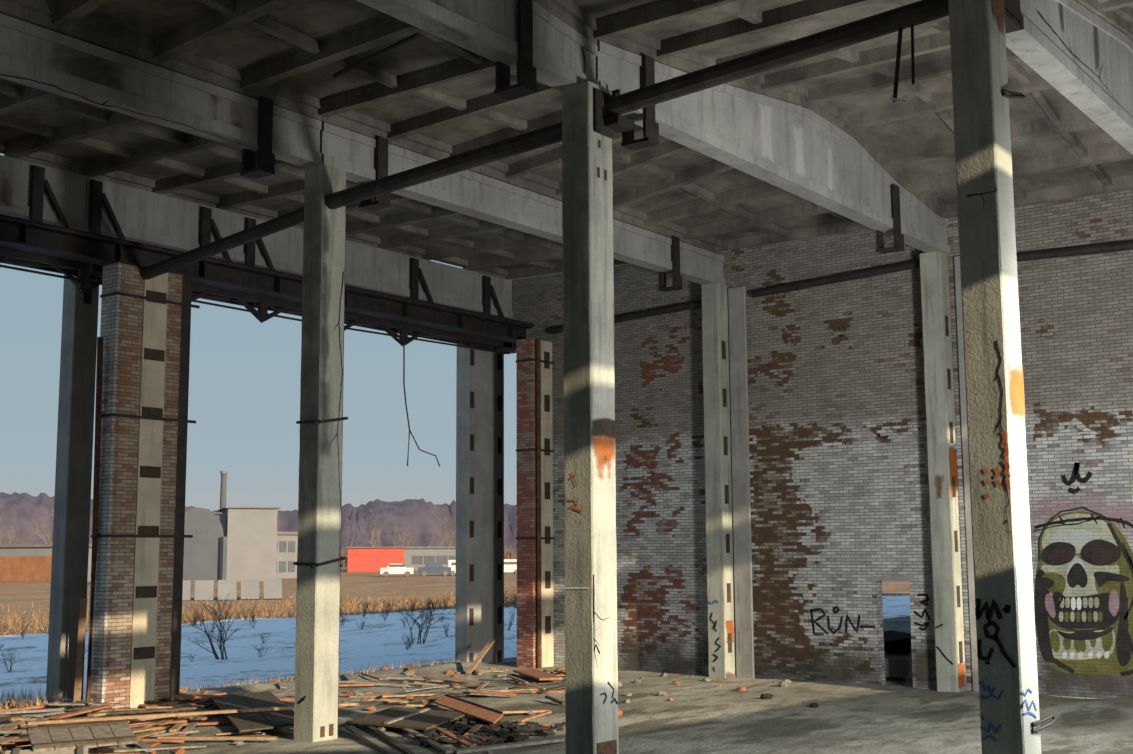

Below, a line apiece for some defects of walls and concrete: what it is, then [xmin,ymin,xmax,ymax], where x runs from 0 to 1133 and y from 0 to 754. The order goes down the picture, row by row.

spalling [1036,319,1055,339]
peeling [640,337,684,395]
rust [592,434,616,476]
peeling [630,407,658,428]
crack [994,340,1010,533]
spalling [1033,403,1133,443]
peeling [622,432,704,537]
peeling [695,557,707,575]
peeling [749,419,921,684]
peeling [620,565,701,657]